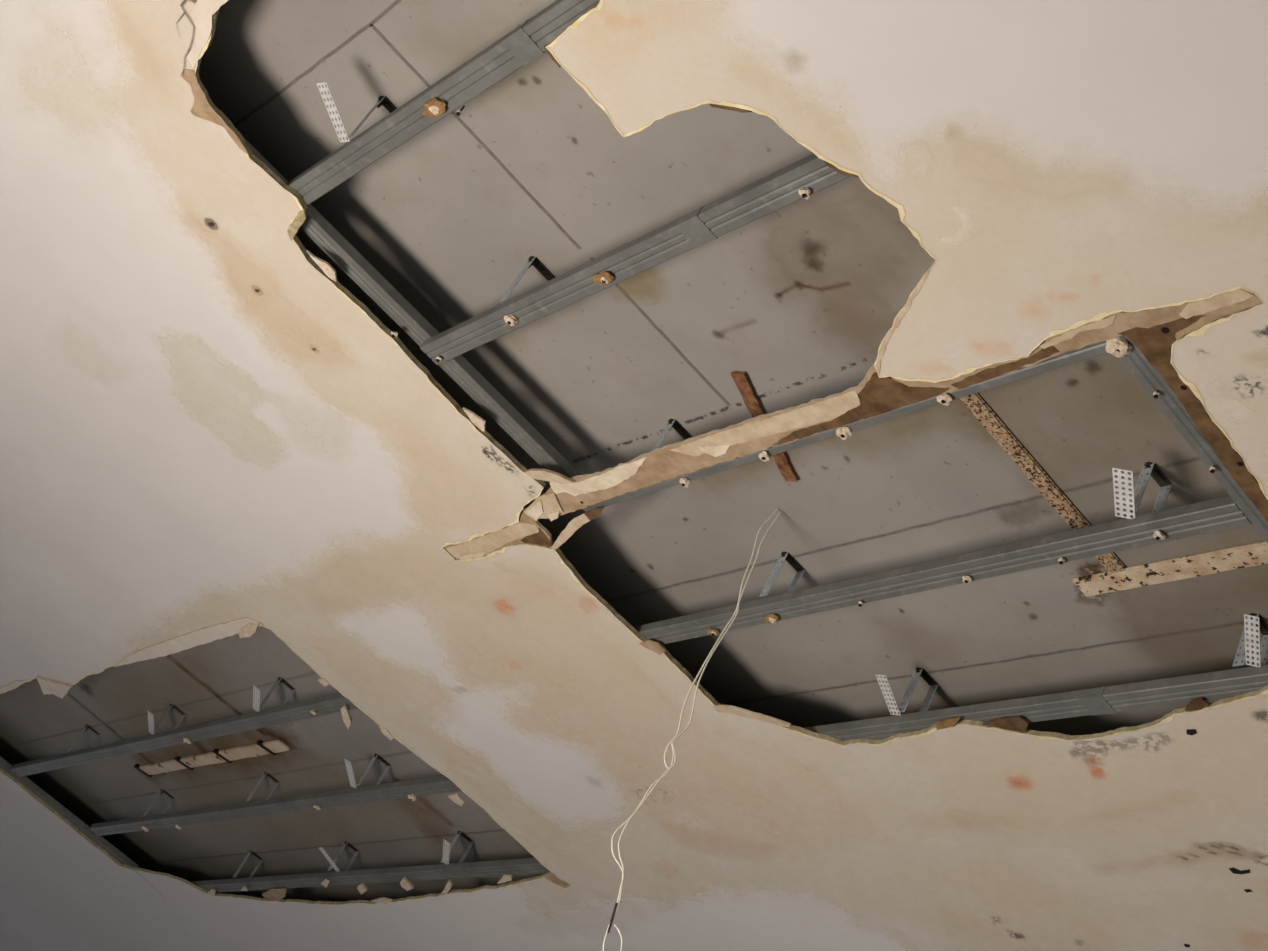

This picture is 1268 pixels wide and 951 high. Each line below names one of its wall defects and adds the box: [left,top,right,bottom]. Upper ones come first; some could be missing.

damp [558,0,689,136]
peeling [180,69,249,155]
peeling [287,209,307,241]
peeling [306,250,338,282]
damp [111,0,537,533]
damp [674,55,1268,497]
peeling [462,407,486,432]
peeling [670,390,860,457]
peeling [549,457,647,496]
damp [138,528,1268,951]
peeling [713,705,791,727]
peeling [982,716,1029,733]